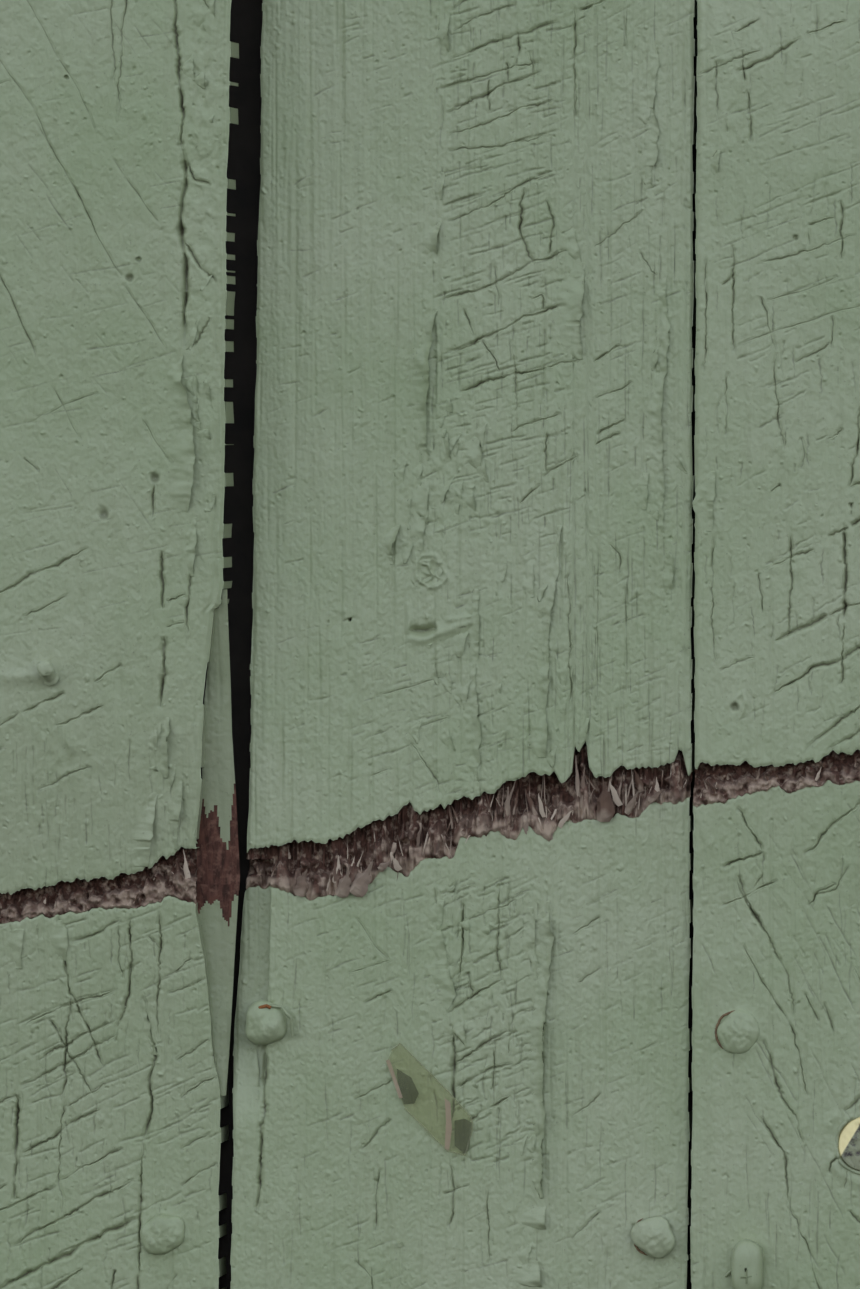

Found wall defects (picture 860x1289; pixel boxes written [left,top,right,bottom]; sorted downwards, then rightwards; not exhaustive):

peeling [150,320,215,577]
spalling [403,601,480,647]
crack [376,675,446,697]
crack [0,664,122,751]
crack [367,716,450,794]
crack [36,766,92,791]
peeling [119,718,197,867]
crack [572,915,601,935]
crack [577,967,602,984]
crack [570,1092,602,1118]
crack [571,1211,601,1240]